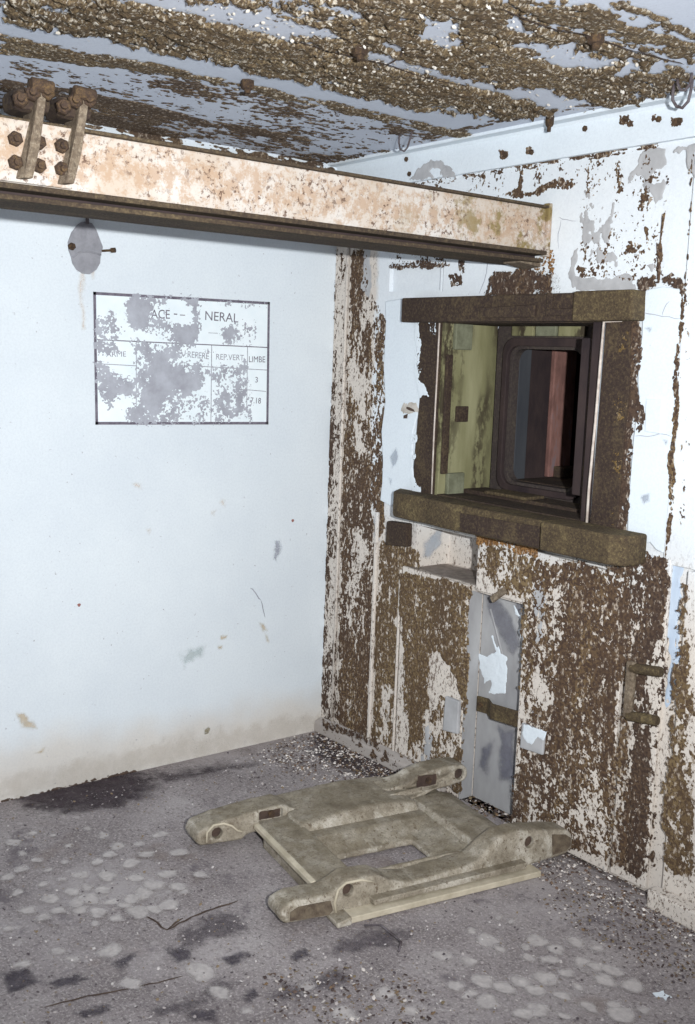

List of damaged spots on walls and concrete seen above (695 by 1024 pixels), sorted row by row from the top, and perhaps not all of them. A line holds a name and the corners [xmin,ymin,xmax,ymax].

peeling [0,60,437,149]
corrosion [85,94,390,170]
peeling [205,6,496,107]
peeling [486,4,645,110]
peeling [568,184,636,291]
peeling [93,293,269,427]
peeling [321,249,400,772]
corrosion [336,249,473,763]
corrosion [414,143,695,879]
peeling [665,565,684,708]
damp [1,770,152,813]
damp [165,766,237,781]